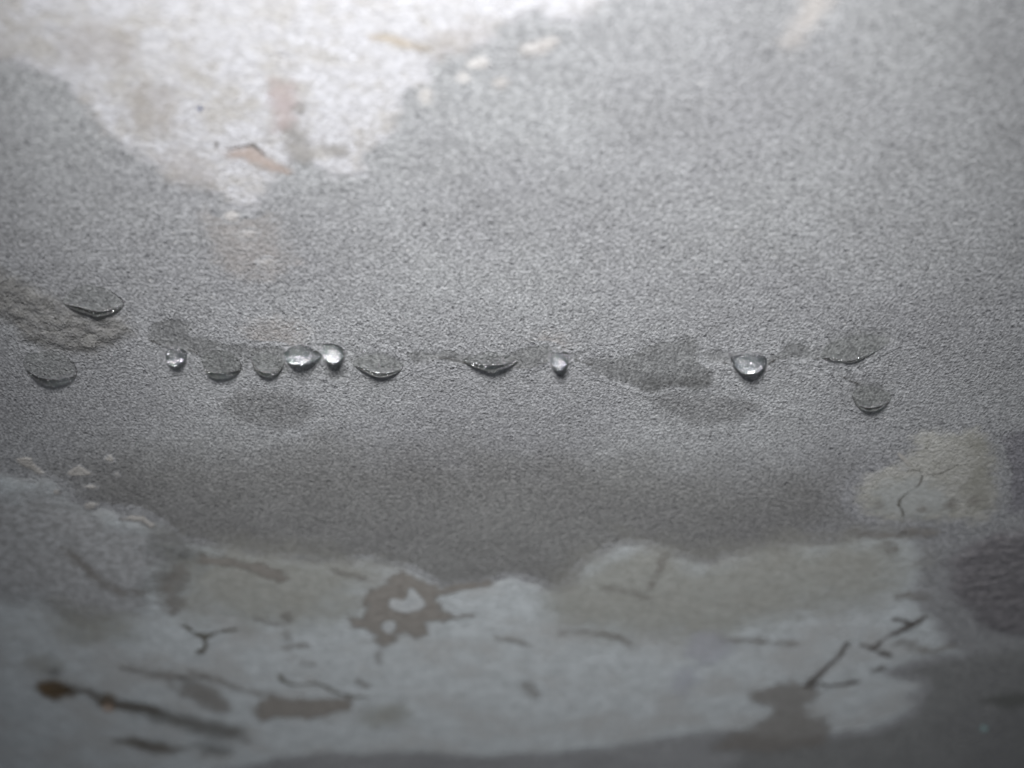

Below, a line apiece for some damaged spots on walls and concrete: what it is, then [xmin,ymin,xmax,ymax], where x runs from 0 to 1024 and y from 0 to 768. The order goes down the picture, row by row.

leakage [0,194,936,630]
peeling [198,555,289,582]
peeling [349,571,492,646]
spalling [931,519,1024,644]
crack [184,625,363,698]
crack [804,615,953,688]
peeling [253,697,352,721]
peeling [717,683,830,752]